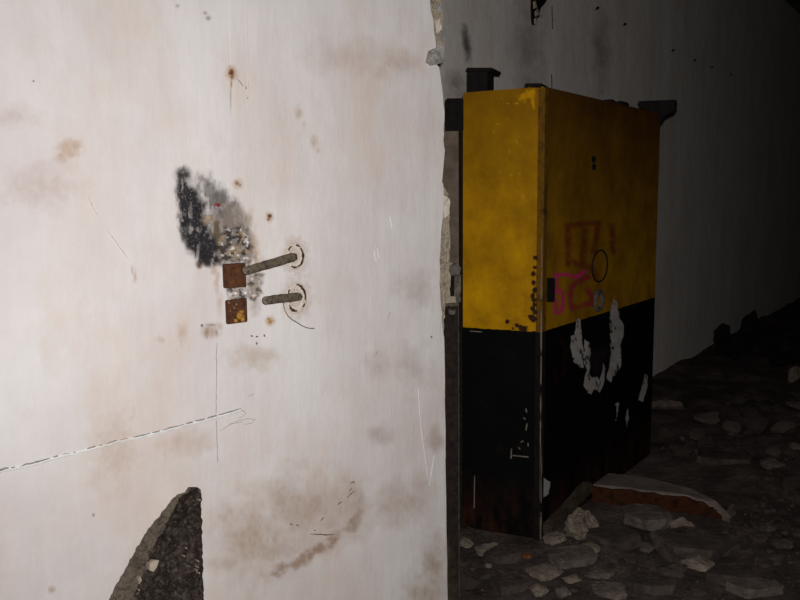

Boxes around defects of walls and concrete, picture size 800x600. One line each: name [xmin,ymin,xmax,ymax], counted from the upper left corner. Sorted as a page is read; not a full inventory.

peeling [218,227,251,263]
spalling [286,243,304,270]
peeling [227,274,263,300]
crack [0,343,255,474]